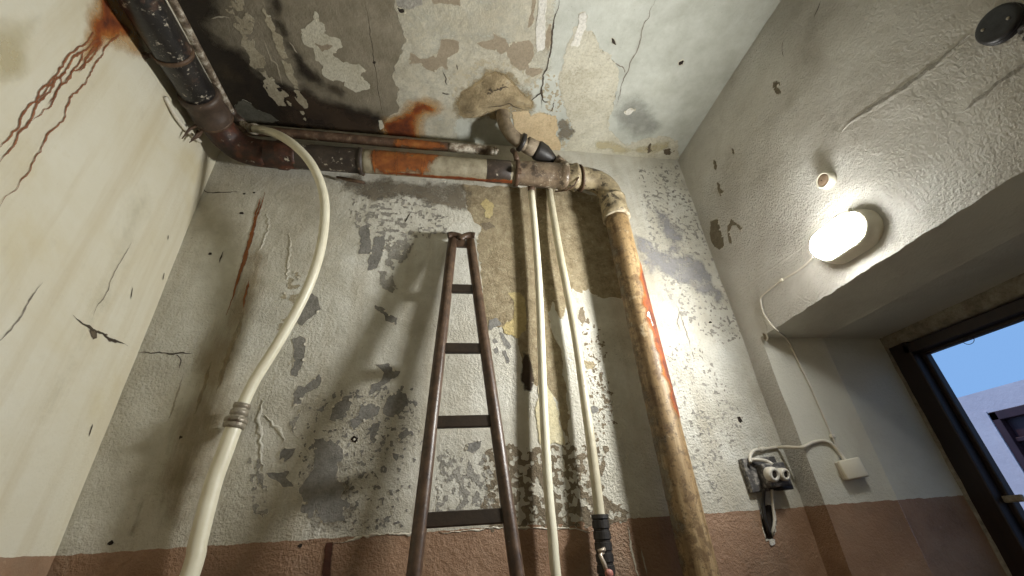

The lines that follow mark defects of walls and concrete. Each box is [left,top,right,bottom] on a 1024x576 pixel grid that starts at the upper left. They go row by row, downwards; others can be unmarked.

corrosion [0,0,140,206]
corrosion [371,101,512,183]
crack [532,6,559,111]
crack [93,242,133,316]
corrosion [226,192,265,315]
peeling [203,0,743,531]
crack [139,352,191,367]
spalling [760,503,777,546]